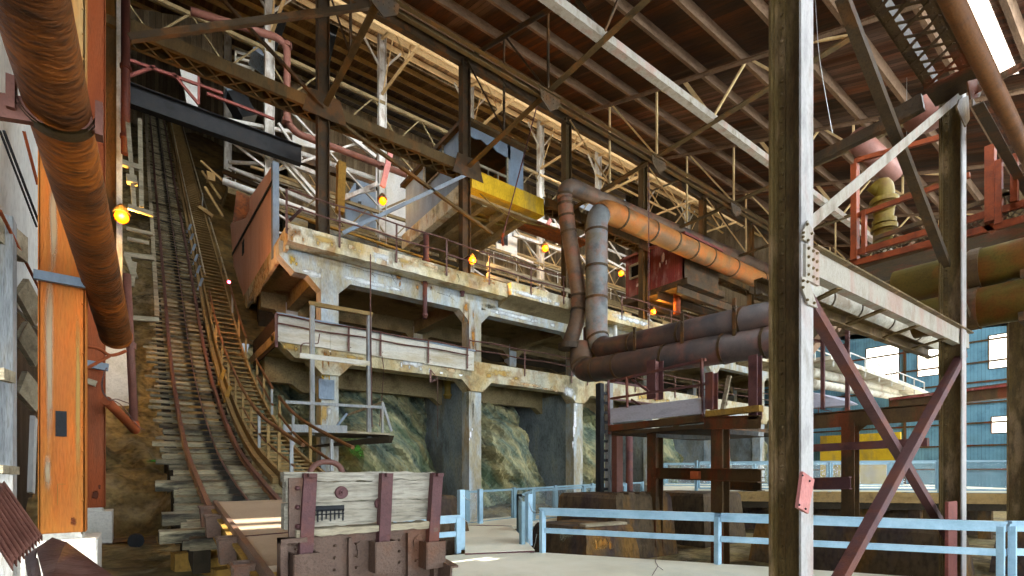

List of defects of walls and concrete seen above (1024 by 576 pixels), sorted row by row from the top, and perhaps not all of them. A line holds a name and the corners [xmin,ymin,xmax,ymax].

efflorescence [345,276,400,291]